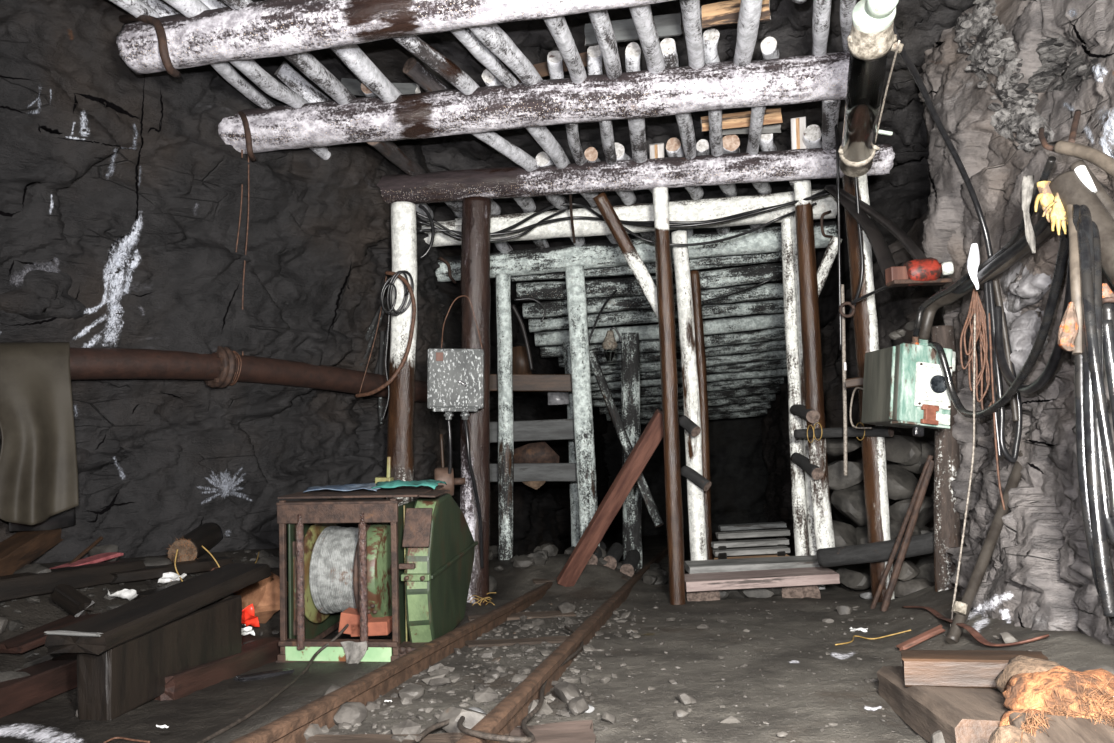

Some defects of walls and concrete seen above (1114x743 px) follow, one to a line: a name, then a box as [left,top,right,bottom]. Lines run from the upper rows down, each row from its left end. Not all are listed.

leakage [73,216,142,348]